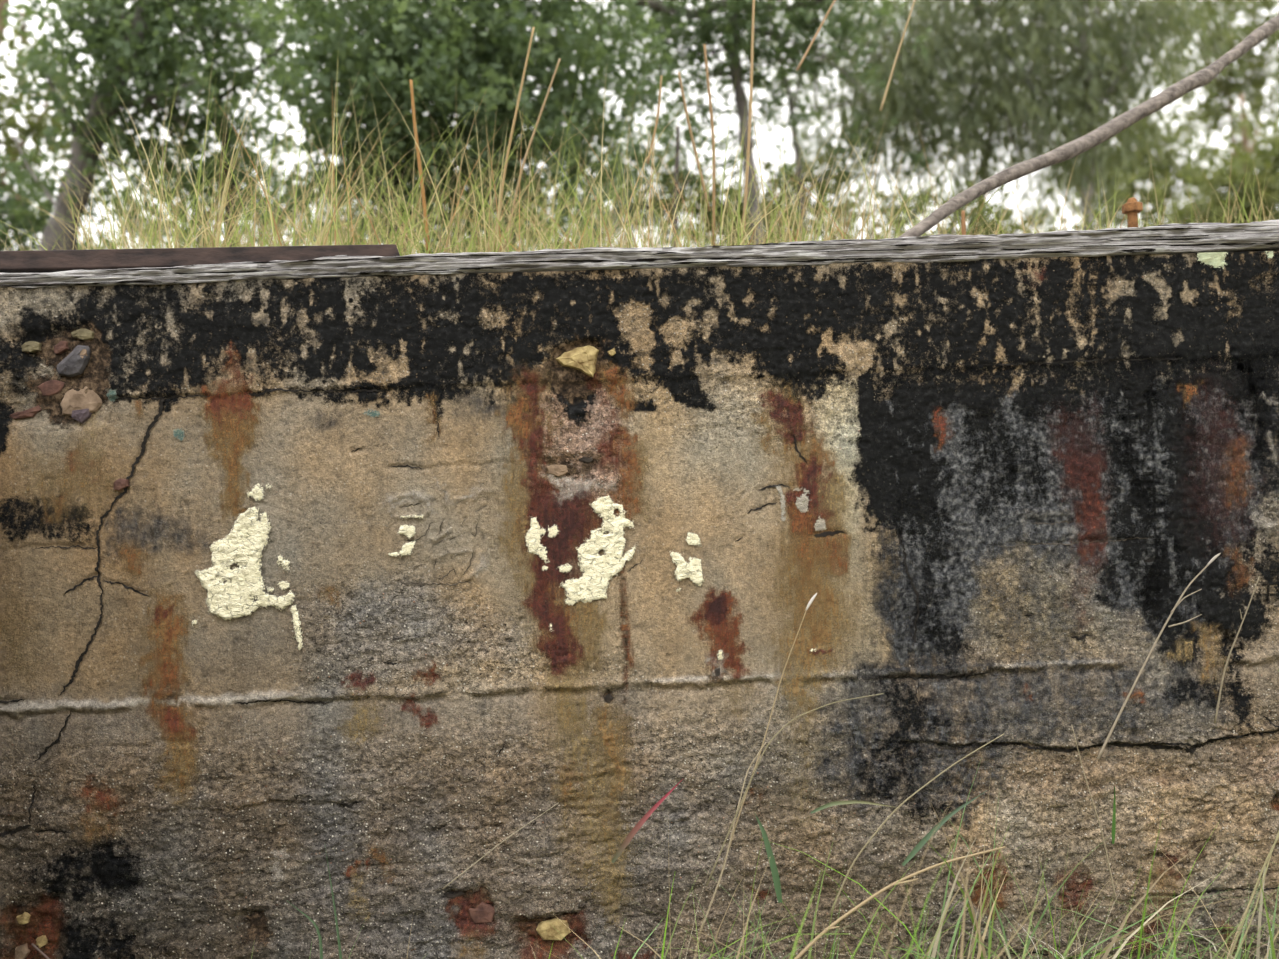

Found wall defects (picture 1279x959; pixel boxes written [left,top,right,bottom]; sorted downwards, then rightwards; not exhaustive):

crack [0,391,206,837]
rust [201,342,260,518]
peeling [247,483,272,501]
peeling [267,550,290,593]
crack [237,698,329,706]
peeling [290,604,304,651]
peeling [524,517,572,575]
rust [495,362,649,959]
leakage [0,251,1279,830]
rust [691,587,748,714]
rust [753,386,859,823]
crack [967,716,1279,754]